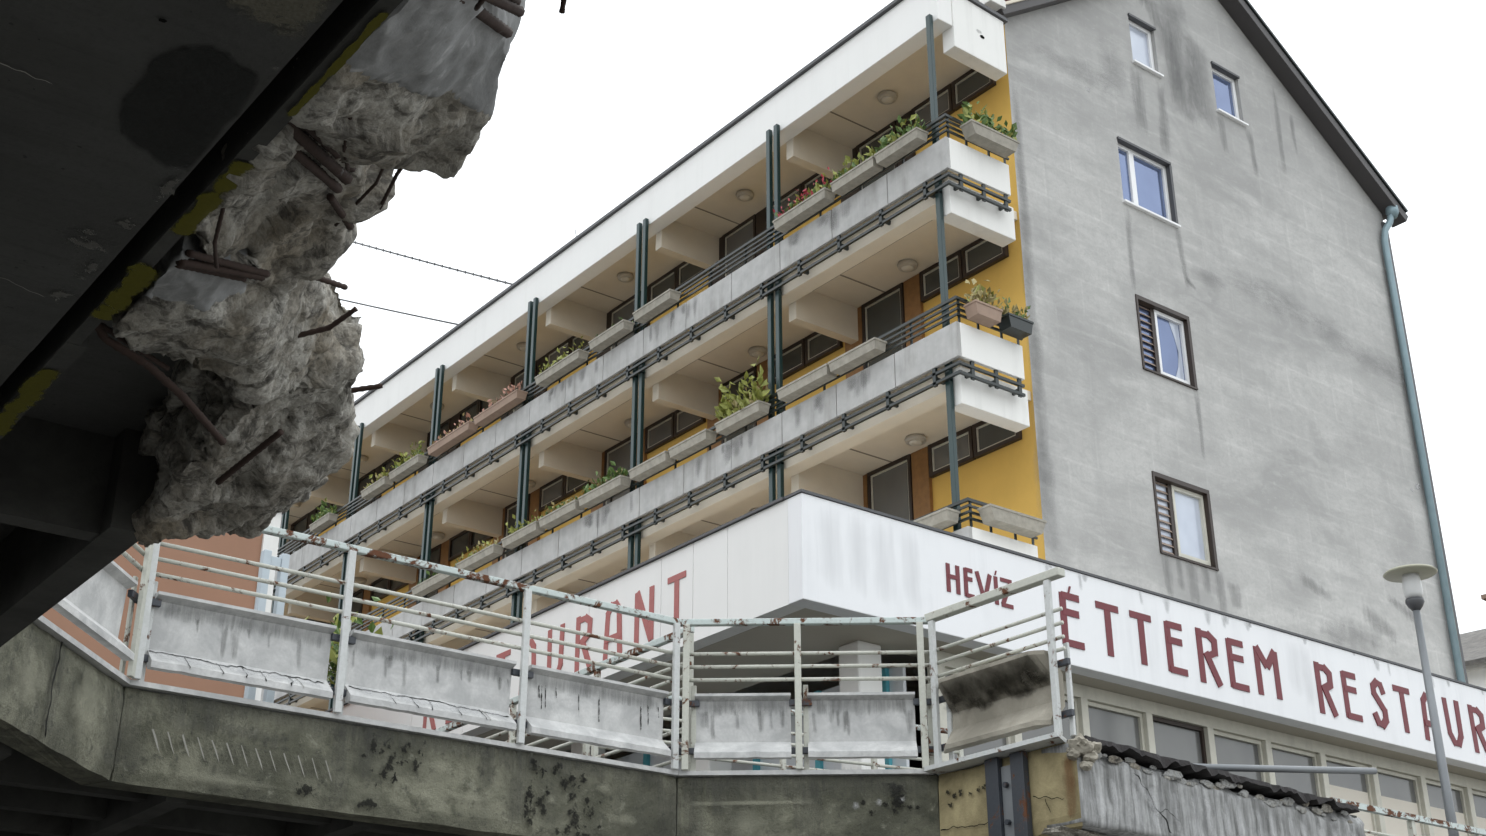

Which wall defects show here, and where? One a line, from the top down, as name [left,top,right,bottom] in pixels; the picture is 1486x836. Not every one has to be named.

spalling [91,0,526,548]
peeling [0,369,61,436]
damp [296,782,315,797]
damp [357,733,426,810]
damp [524,758,602,836]
spalling [1066,733,1353,824]